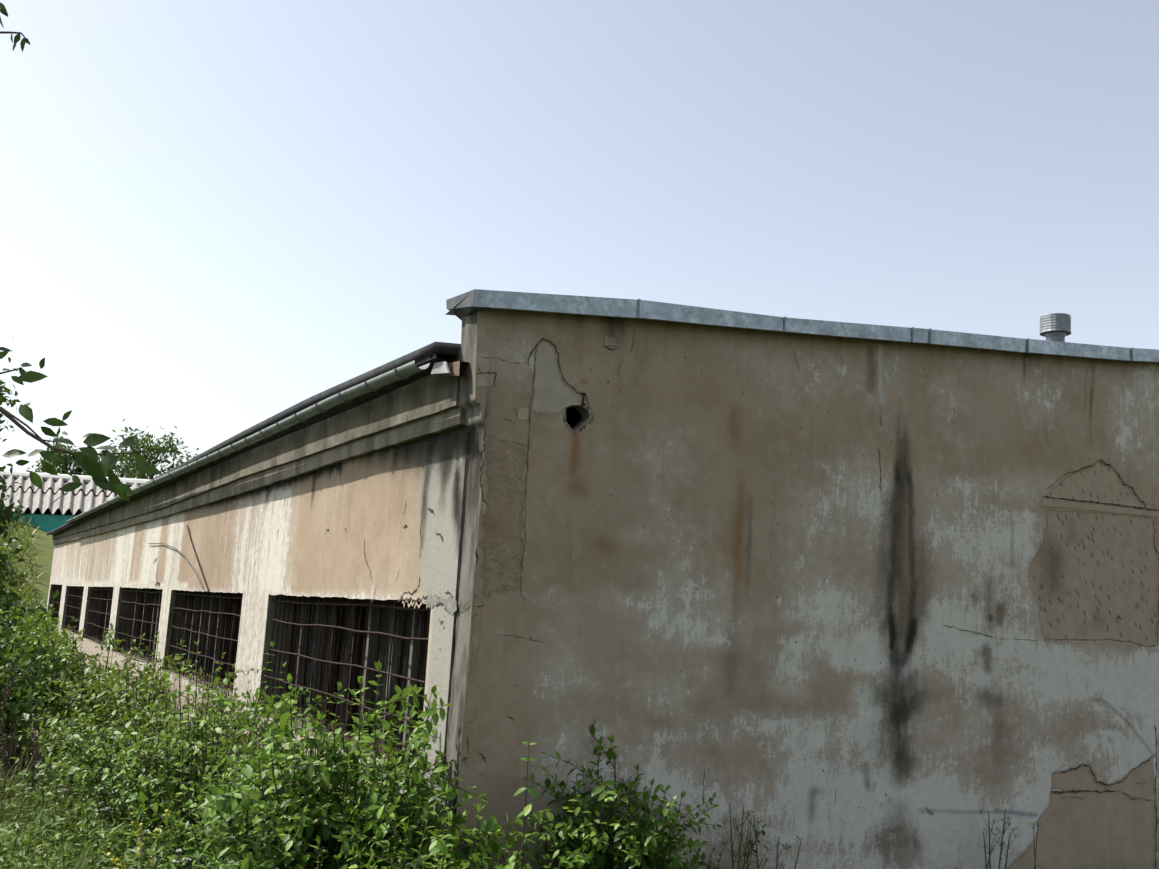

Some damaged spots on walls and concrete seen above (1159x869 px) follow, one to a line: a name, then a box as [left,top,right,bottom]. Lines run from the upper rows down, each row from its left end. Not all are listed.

flaking render [513,338,594,434]
leakage [368,413,486,540]
flaking render [1043,459,1159,517]
flaking render [469,594,484,682]
leakage [884,461,919,767]
flaking render [1018,756,1155,857]